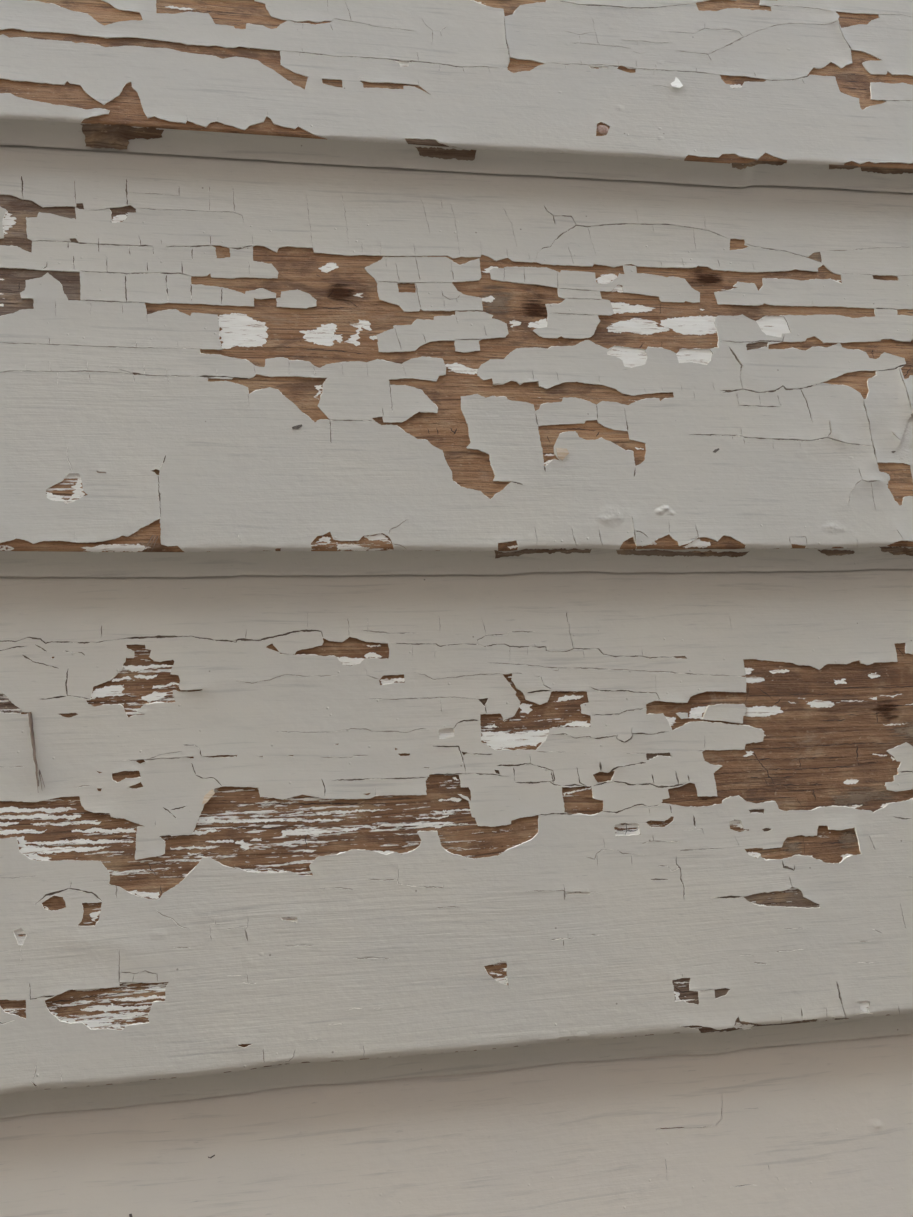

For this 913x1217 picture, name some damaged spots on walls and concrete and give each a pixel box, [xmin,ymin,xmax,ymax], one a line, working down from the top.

peeling [0,79,326,150]
peeling [0,0,343,90]
peeling [808,51,913,110]
peeling [0,268,81,316]
crack [330,200,721,442]
peeling [145,245,913,505]
peeling [0,519,184,552]
peeling [86,644,201,718]
peeling [478,674,591,750]
peeling [614,643,913,836]
peeling [0,775,539,899]
peeling [45,982,168,1030]